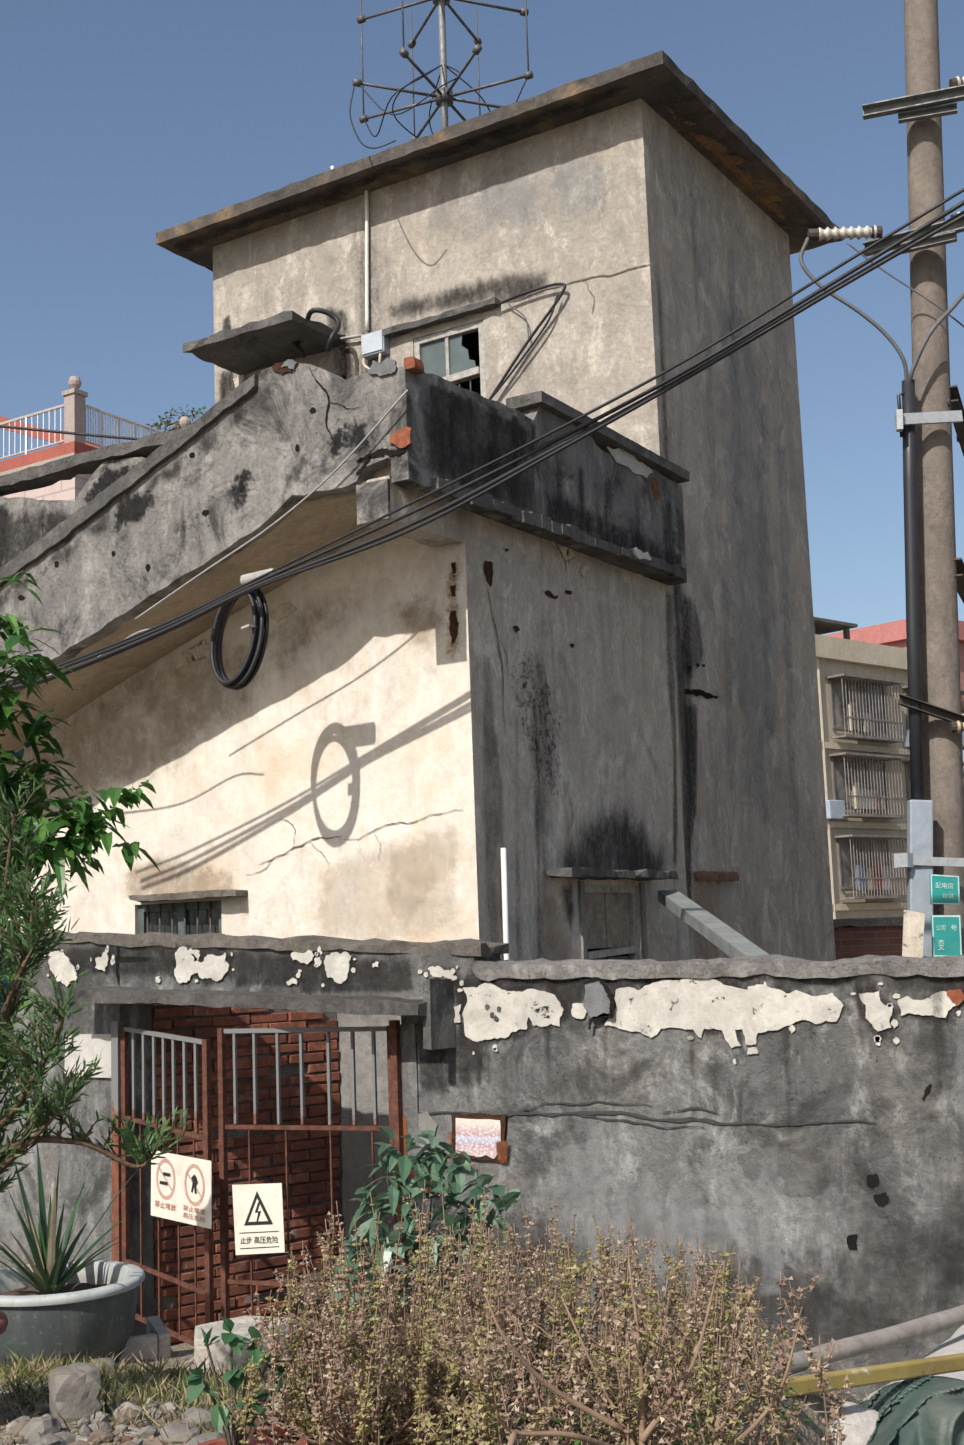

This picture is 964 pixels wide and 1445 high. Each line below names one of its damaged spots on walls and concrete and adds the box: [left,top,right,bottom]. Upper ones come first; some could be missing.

damp [393,276,544,314]
mould [230,469,253,509]
spalling [356,426,412,475]
damp [427,385,535,509]
damp [548,466,681,566]
damp [512,650,566,794]
damp [667,584,702,899]
crack [249,809,463,875]
peeling [155,946,235,983]
peeling [286,946,379,987]
peeling [418,965,587,1055]
peeling [604,978,964,1064]